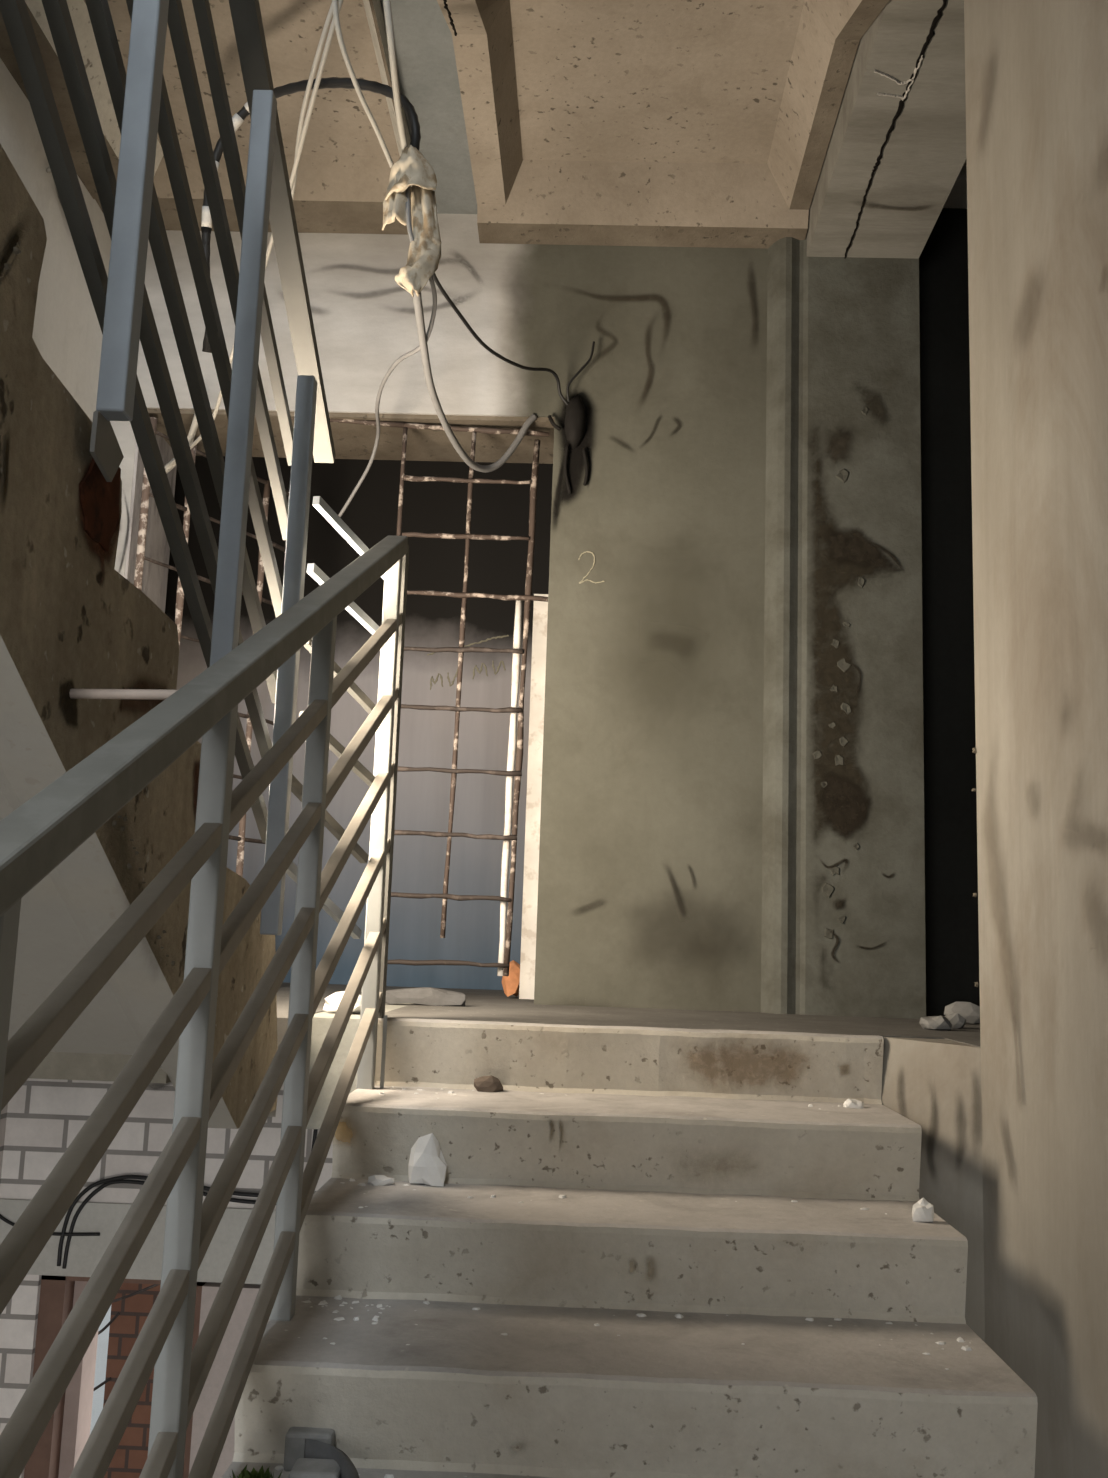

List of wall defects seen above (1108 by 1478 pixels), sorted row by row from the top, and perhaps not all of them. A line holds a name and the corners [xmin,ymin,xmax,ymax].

crack [844,0,947,258]
corrosion [80,467,120,583]
flaking render [809,430,901,961]